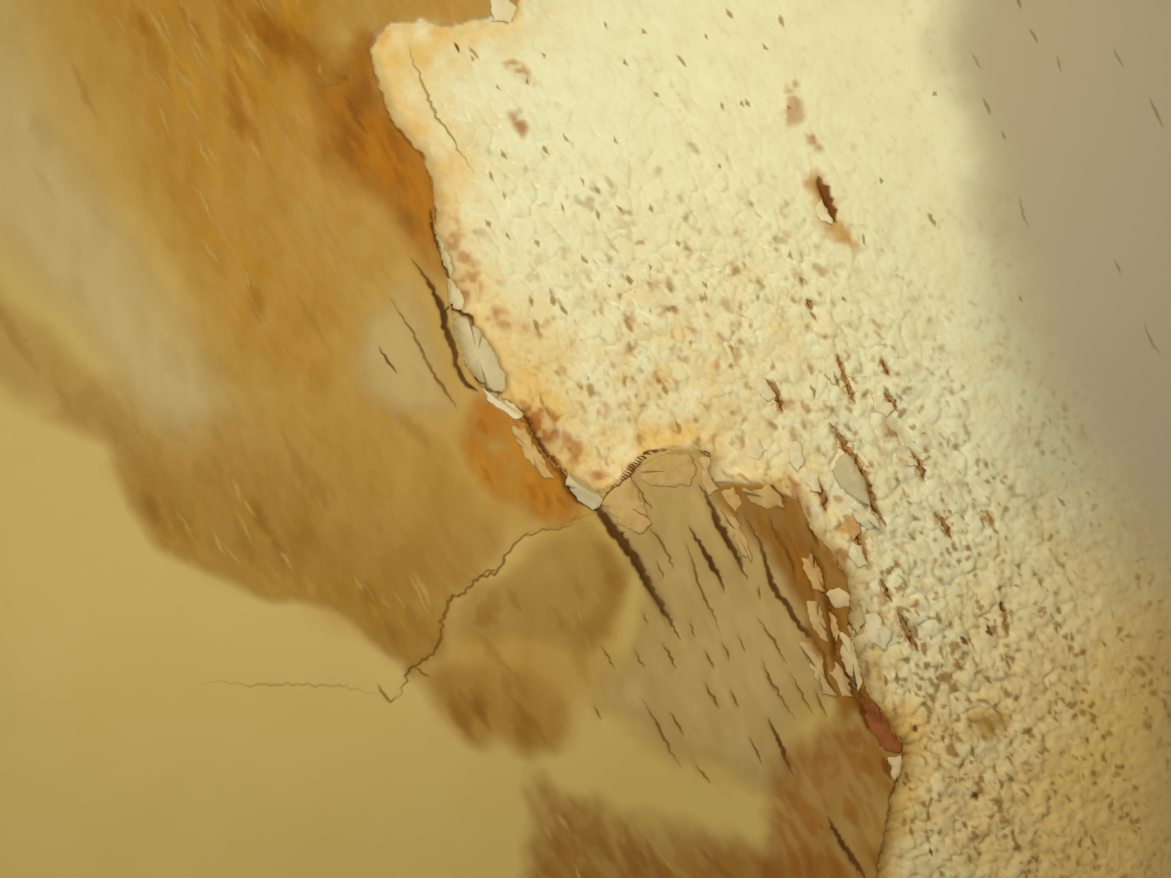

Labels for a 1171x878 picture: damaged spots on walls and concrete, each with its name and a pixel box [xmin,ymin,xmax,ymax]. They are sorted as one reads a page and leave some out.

damp [0,68,209,415]
damp [45,0,549,663]
flaking render [369,0,1171,878]
crack [379,528,555,703]
damp [463,627,561,749]